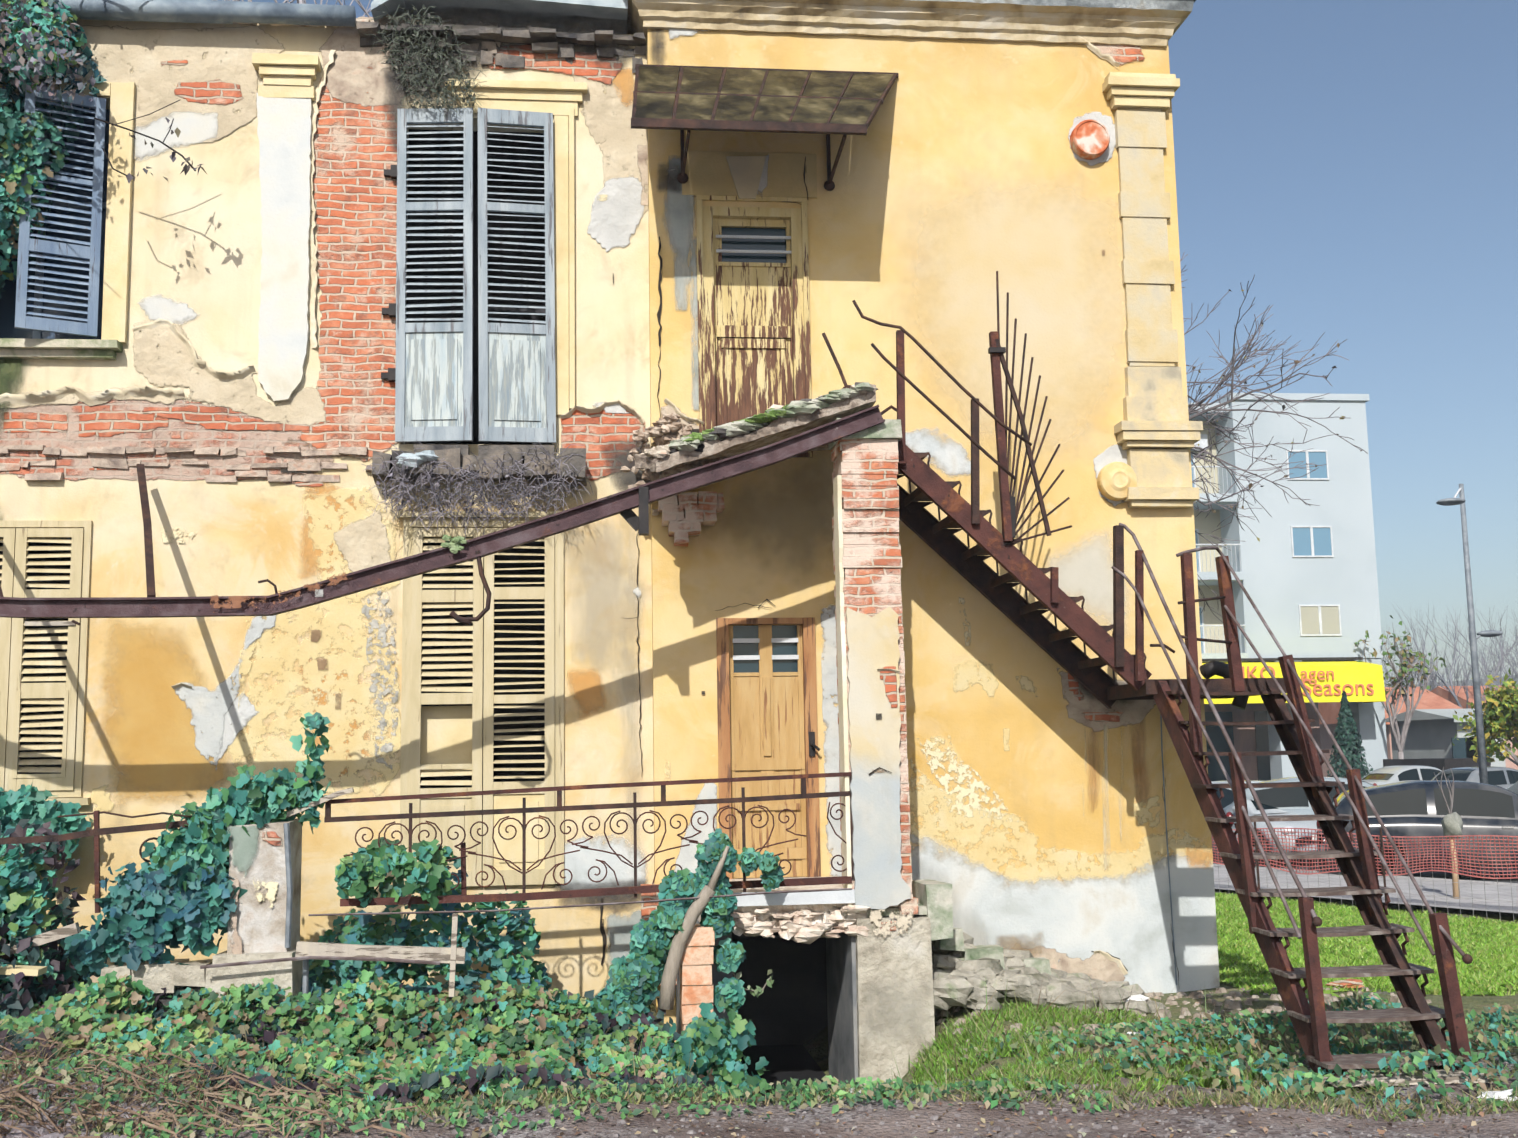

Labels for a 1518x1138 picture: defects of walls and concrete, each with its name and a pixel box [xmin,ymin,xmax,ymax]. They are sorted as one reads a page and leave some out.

peeling [487,45,648,252]
spalling [1077,35,1145,67]
spalling [0,14,407,581]
peeling [91,580,401,812]
peeling [953,597,999,697]
spalling [1057,668,1156,732]
flaking render [909,736,1220,994]